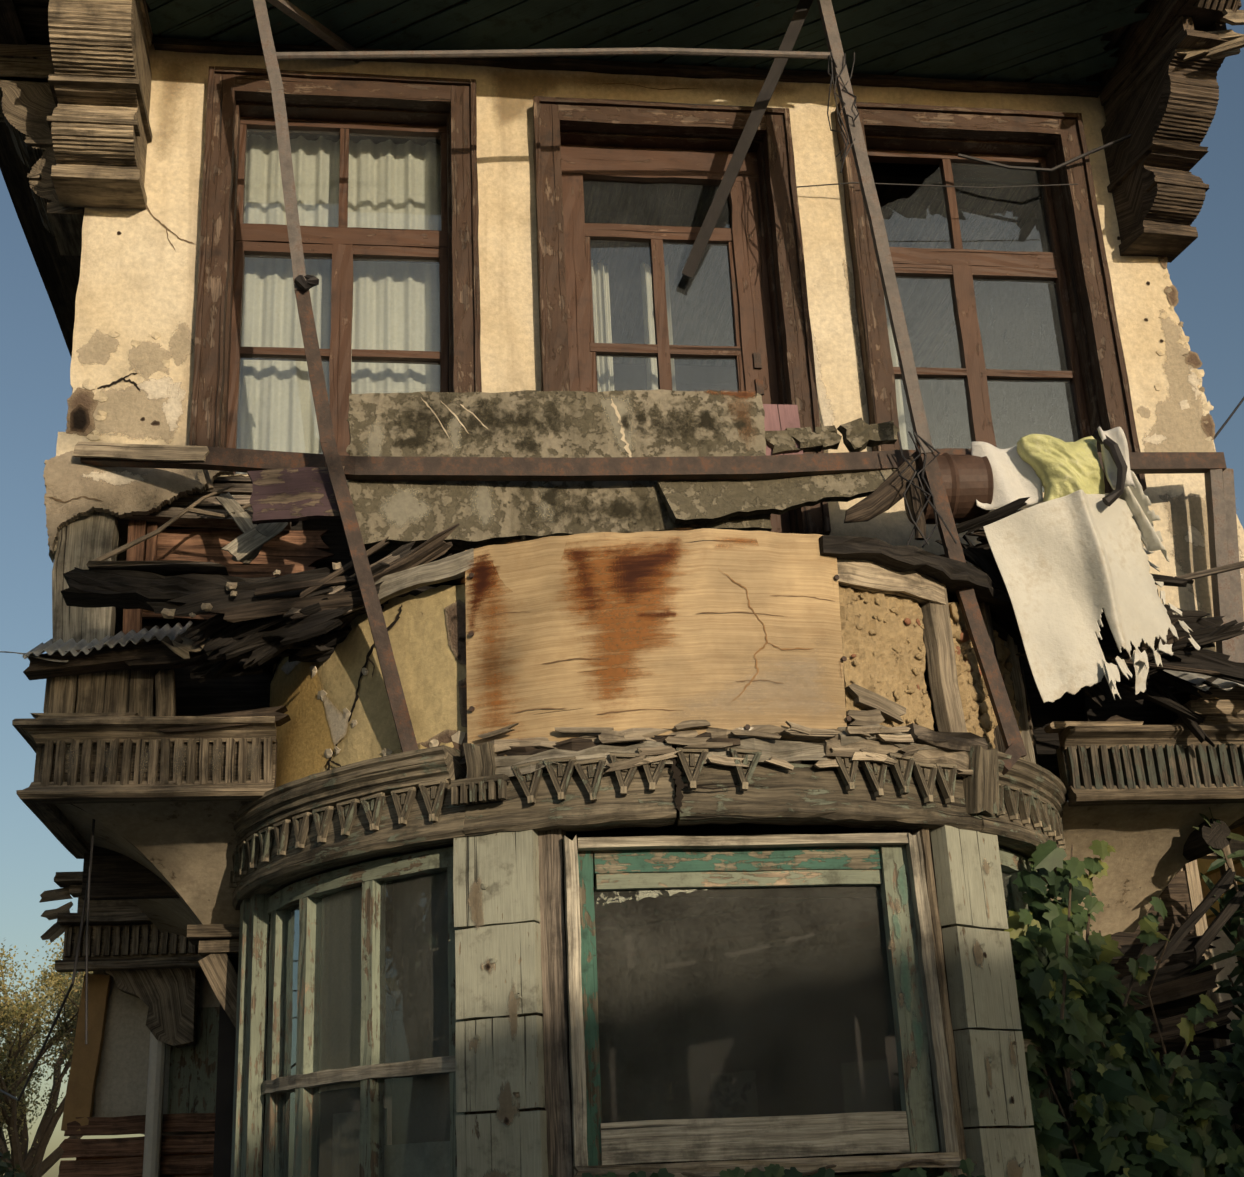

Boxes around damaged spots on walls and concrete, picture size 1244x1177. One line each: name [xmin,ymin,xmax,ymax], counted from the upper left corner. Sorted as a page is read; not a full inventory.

peeling [66,323,194,442]
water stain [394,398,567,450]
water stain [601,396,728,457]
peeling [1137,256,1215,452]
water stain [381,488,429,526]
water stain [472,481,492,524]
crack [327,605,402,770]
corrosion [469,554,515,727]
corrosion [565,539,682,699]
crack [600,707,684,715]
crack [696,595,832,617]
peeling [890,865,923,1075]